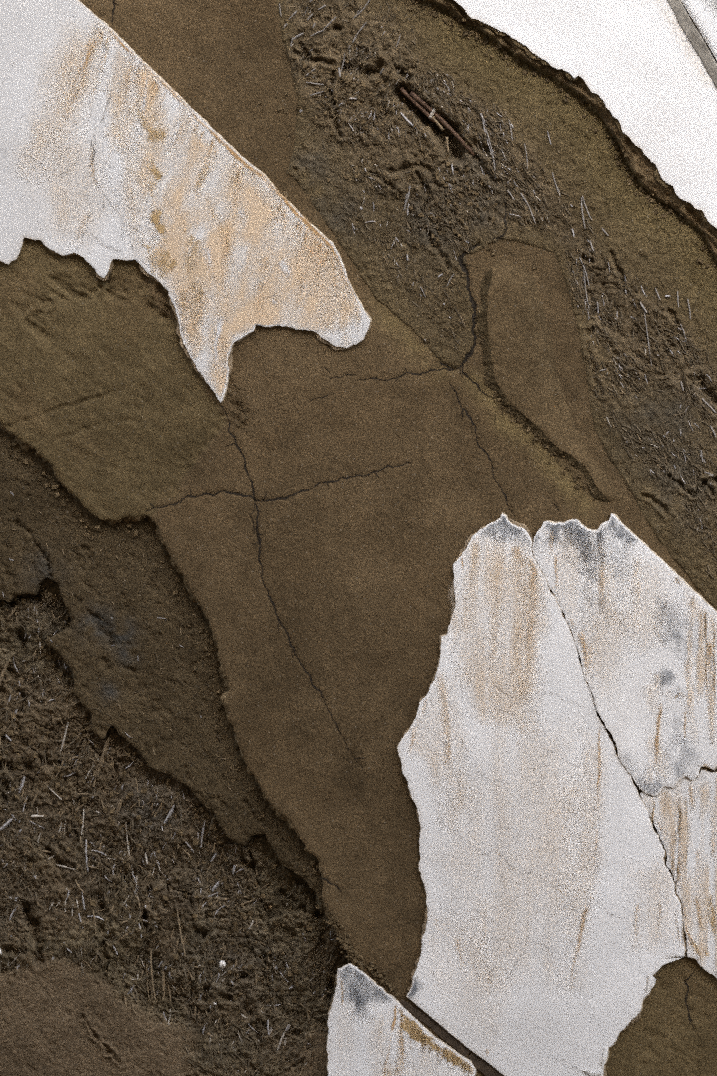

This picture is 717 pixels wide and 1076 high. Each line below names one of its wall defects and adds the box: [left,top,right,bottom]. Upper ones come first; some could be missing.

flaking render [0,0,372,403]
crack [310,200,516,518]
spalling [0,578,477,1076]
crack [146,407,411,770]
spalling [276,0,717,1076]
crack [560,694,618,755]
mould [549,516,636,563]
crack [632,777,676,890]
water stain [399,1010,473,1071]